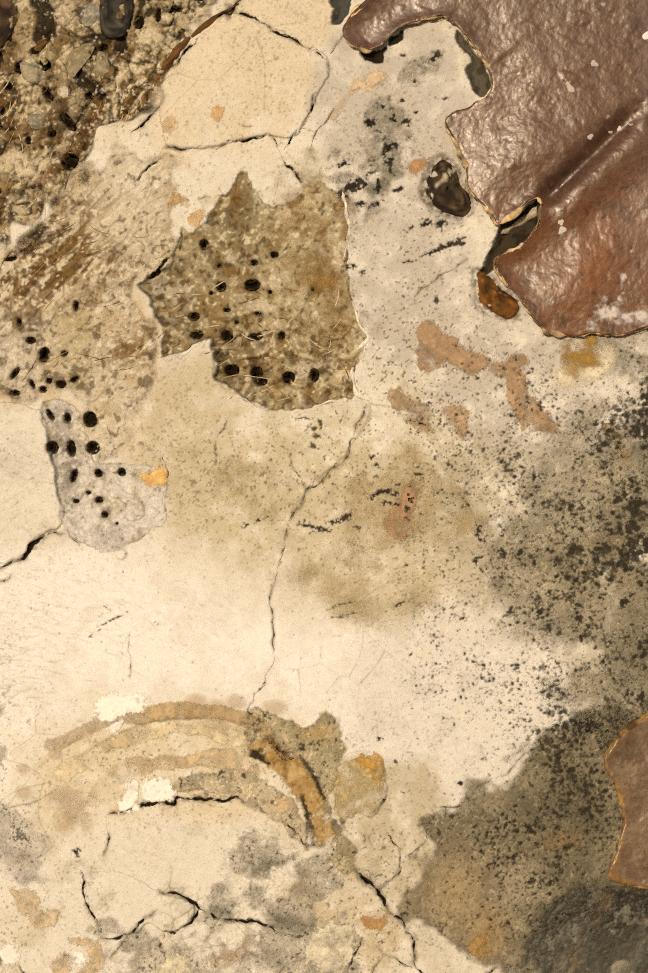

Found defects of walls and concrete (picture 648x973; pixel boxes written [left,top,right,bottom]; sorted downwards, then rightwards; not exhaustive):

damp [364,119,398,174]
damp [338,170,385,209]
rust [477,272,519,319]
flaking render [0,144,373,553]
crack [0,532,78,581]
damp [298,341,648,973]
flaking render [94,691,147,739]
crack [104,796,264,852]
flaking render [88,707,360,973]
crack [349,741,545,973]
crack [80,870,303,957]
flaking render [67,950,87,970]